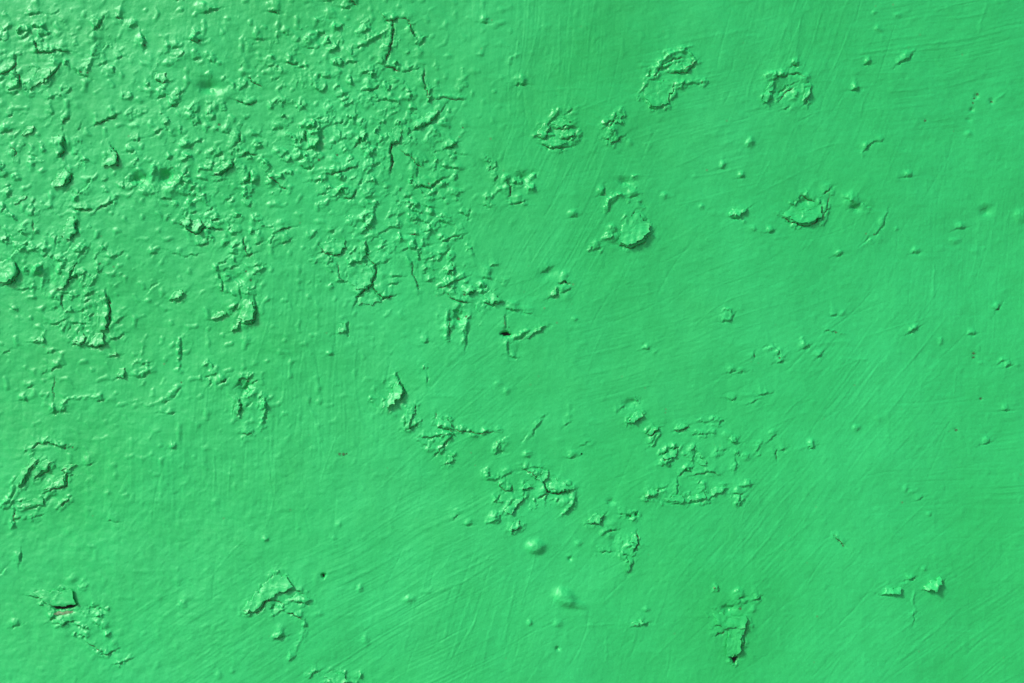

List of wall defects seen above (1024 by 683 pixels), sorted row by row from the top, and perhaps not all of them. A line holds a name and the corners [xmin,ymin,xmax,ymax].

peeling [774,181,837,231]
peeling [0,0,820,583]
peeling [23,570,135,670]
peeling [237,563,366,683]
peeling [704,582,767,668]
peeling [875,564,947,629]